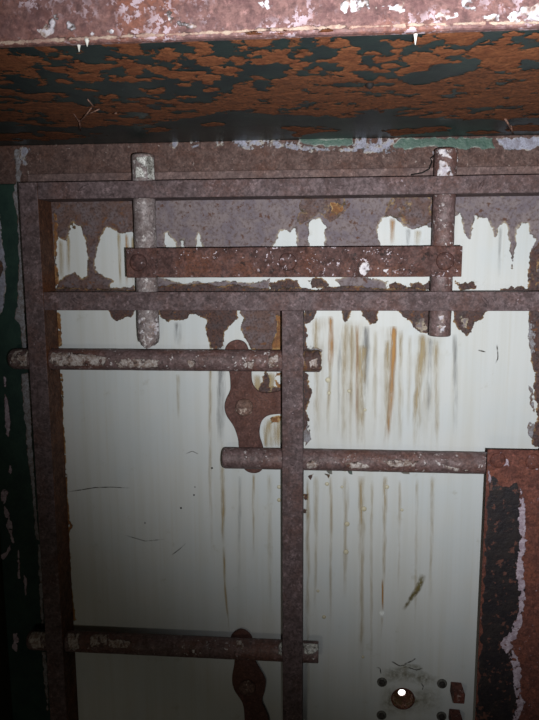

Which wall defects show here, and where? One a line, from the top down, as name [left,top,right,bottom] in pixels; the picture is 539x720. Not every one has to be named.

peeling [0,0,539,103]
rust [0,65,539,142]
peeling [51,201,136,291]
peeling [156,197,433,248]
peeling [335,261,388,289]
peeling [455,196,539,290]
rust [303,319,333,446]
rust [351,329,368,384]
peeling [361,311,379,325]
rust [387,328,401,408]
peeling [399,311,487,336]
peeling [475,470,527,720]